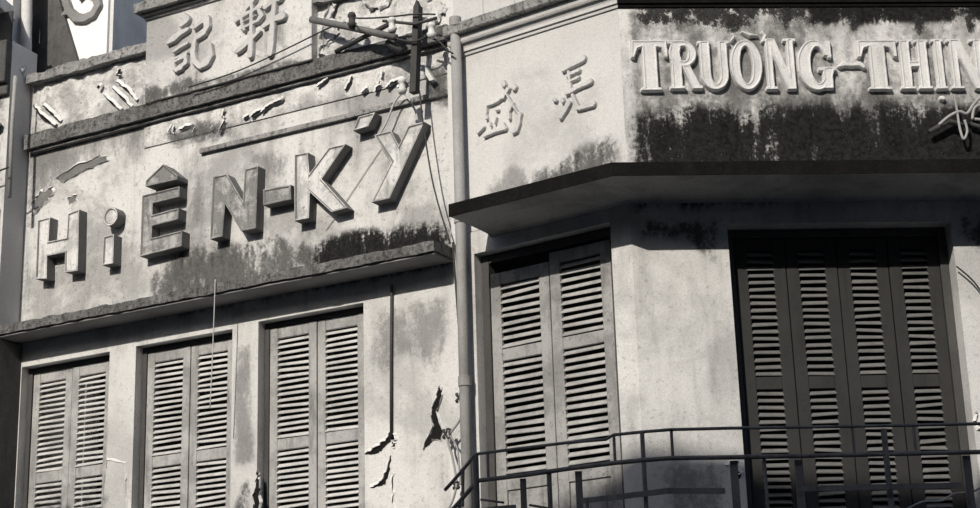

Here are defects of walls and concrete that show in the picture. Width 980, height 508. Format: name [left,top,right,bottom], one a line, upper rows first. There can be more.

leakage [634,102,980,162]
spalling [31,156,110,216]
leakage [152,223,449,296]
flaking render [423,383,444,451]